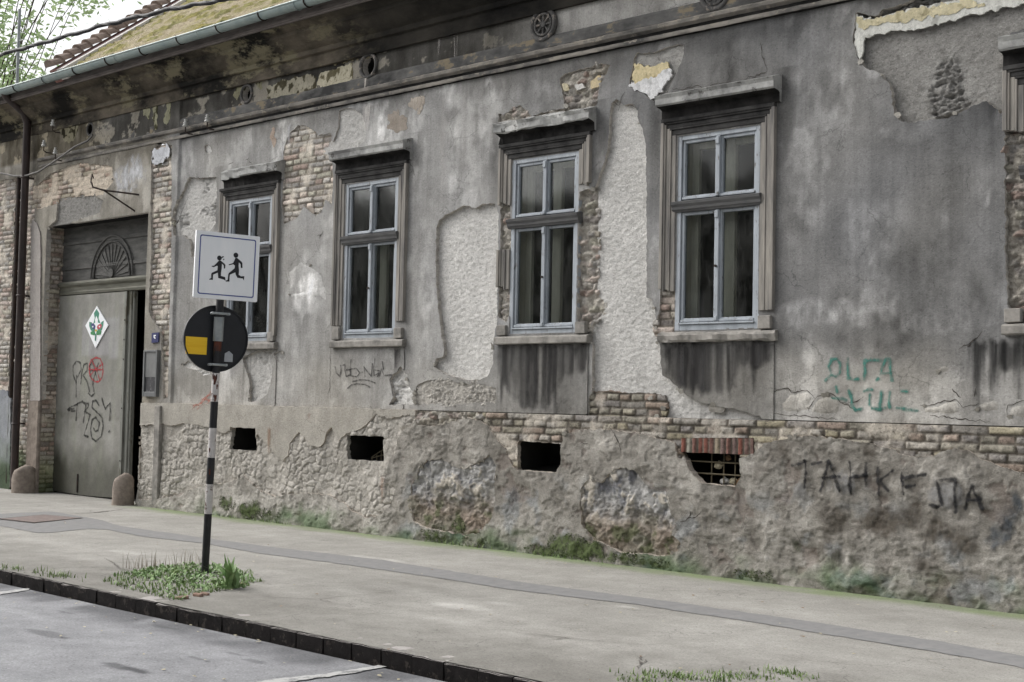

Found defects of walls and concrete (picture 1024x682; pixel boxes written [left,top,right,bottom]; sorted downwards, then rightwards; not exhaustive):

peeling [225,62,353,100]
spalling [628,45,684,101]
spalling [854,0,1024,123]
flaking render [33,163,113,231]
spalling [138,96,1024,518]
leakage [500,344,556,407]
leakage [569,343,587,372]
leakage [667,342,729,393]
leakage [744,340,767,382]
leakage [974,341,1024,386]
crack [774,388,863,420]
crack [921,388,1024,422]